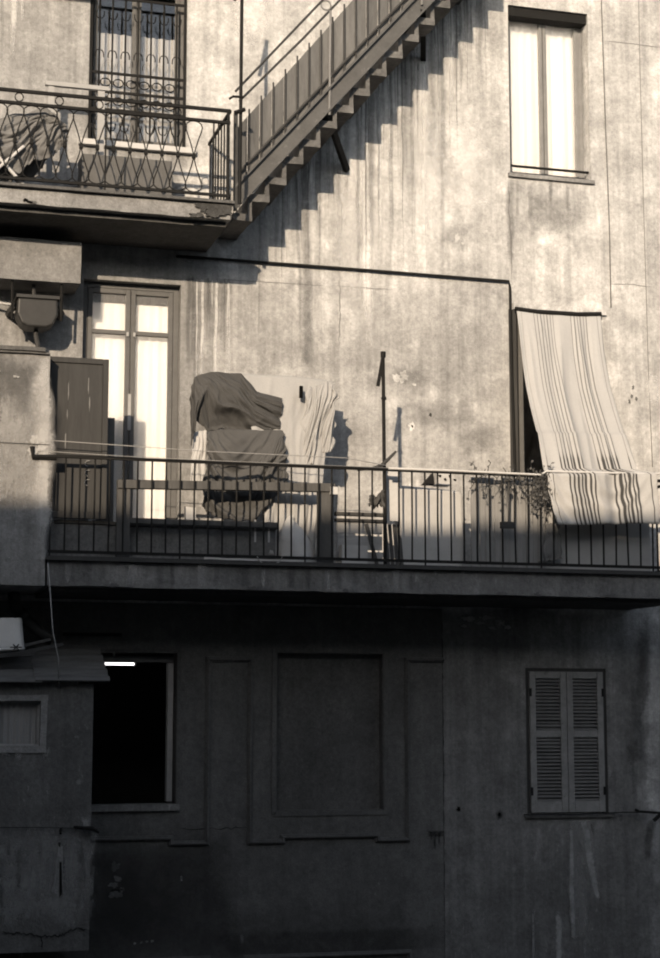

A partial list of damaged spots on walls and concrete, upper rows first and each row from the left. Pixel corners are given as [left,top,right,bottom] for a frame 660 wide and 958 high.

leakage [196,280,230,367]
leakage [556,820,599,958]
crack [2,927,89,947]